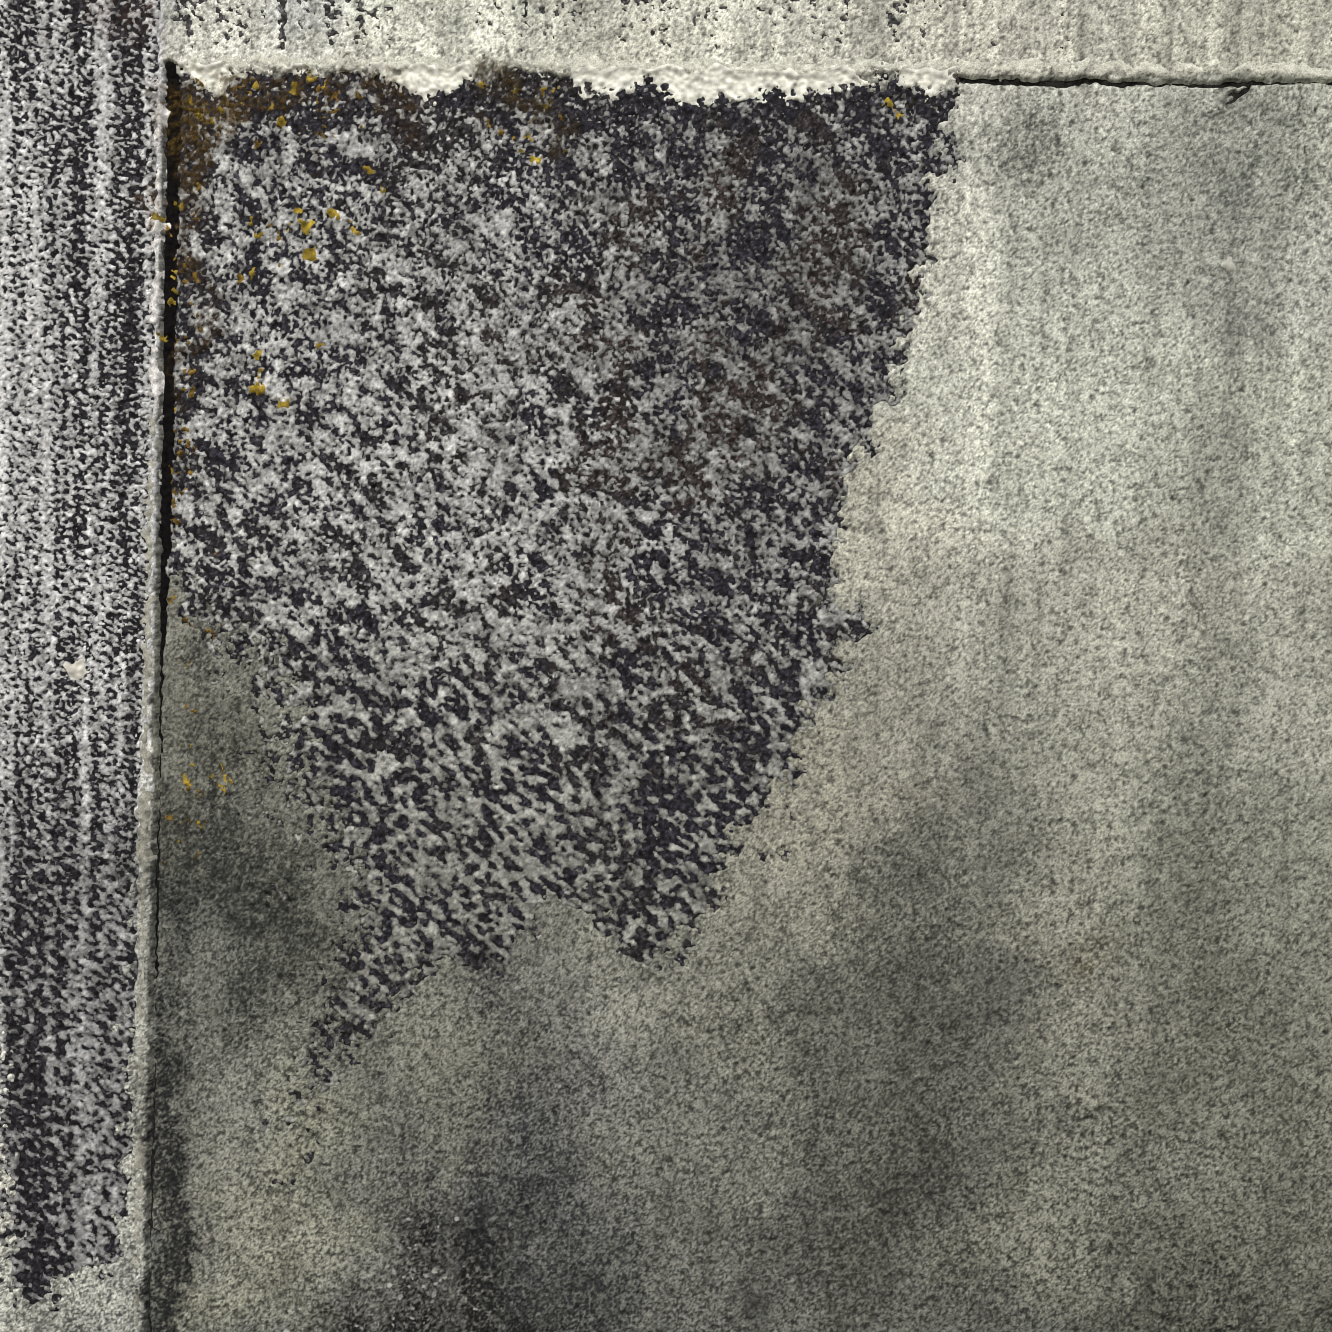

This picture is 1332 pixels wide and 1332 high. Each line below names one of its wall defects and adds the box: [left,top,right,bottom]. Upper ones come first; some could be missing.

crack [959,77,1332,105]
peeling [0,0,967,1312]
water stain [157,627,319,1047]
water stain [133,986,196,1332]
water stain [331,1143,553,1332]
water stain [485,1087,572,1215]
water stain [551,1259,620,1327]